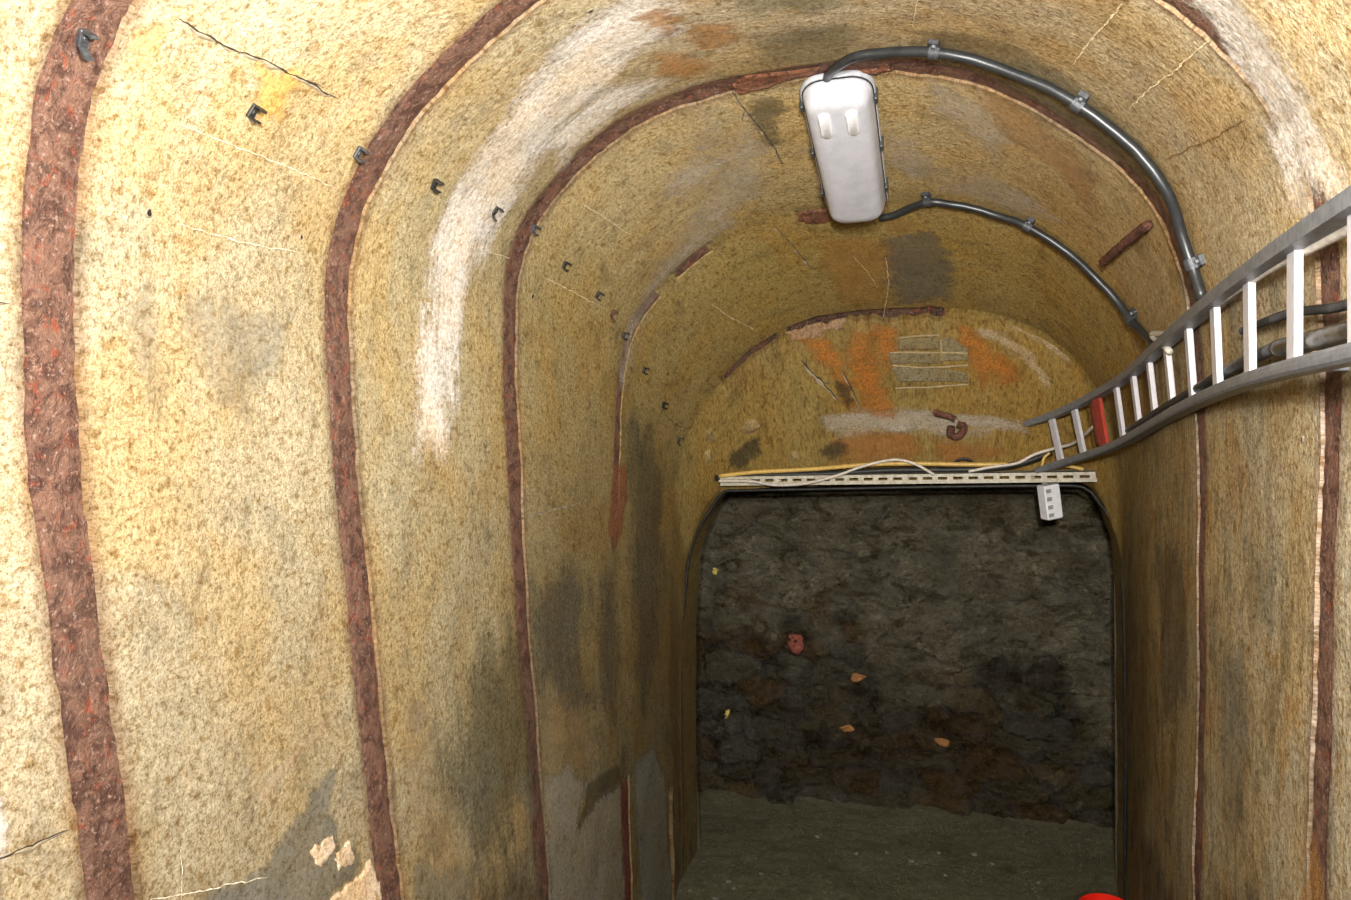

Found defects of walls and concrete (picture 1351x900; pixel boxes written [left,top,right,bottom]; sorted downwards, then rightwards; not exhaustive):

crack [177,17,338,99]
efflorescence [413,0,691,459]
corrosion [801,328,895,416]
corrosion [832,433,921,461]
corrosion [933,410,1002,461]
peeling [310,835,382,900]